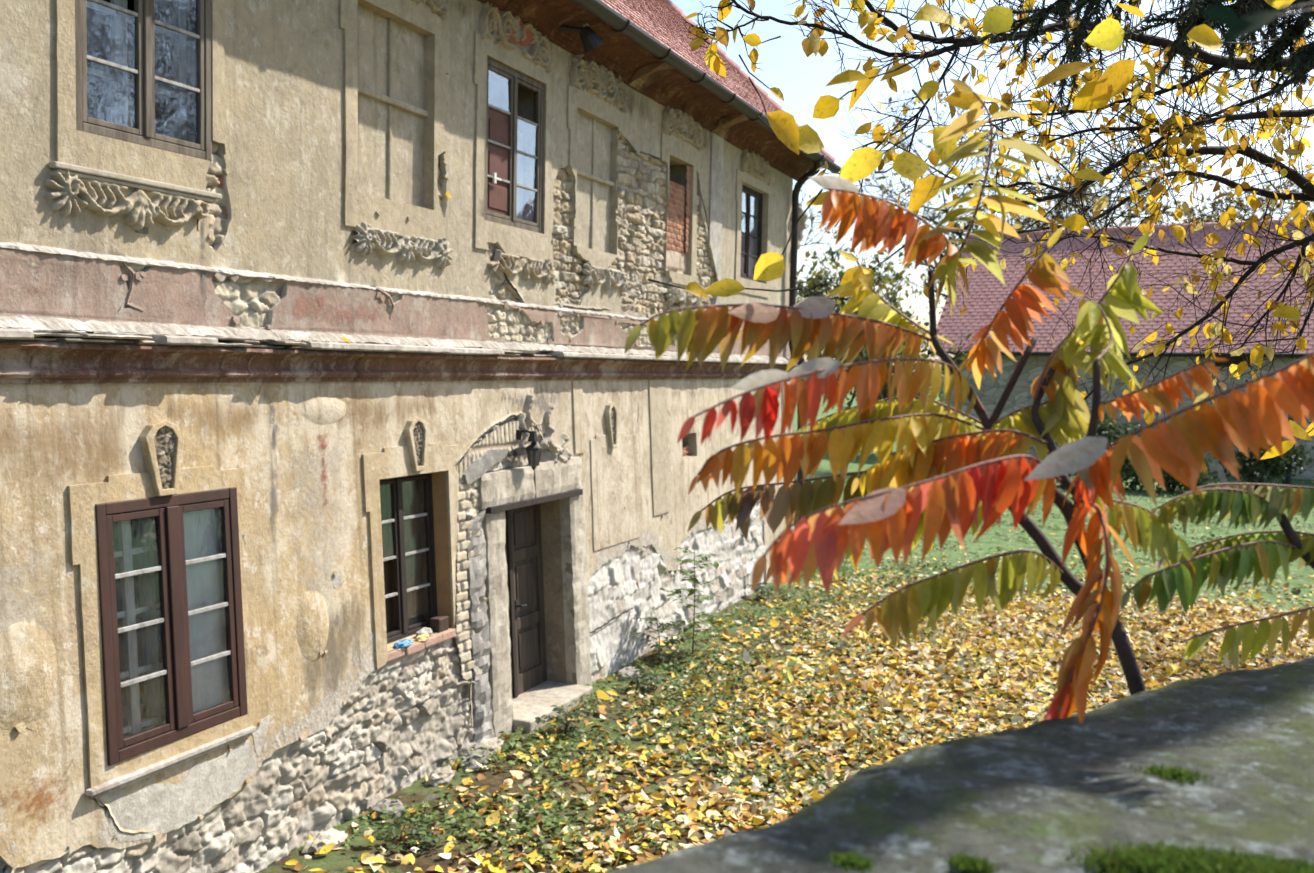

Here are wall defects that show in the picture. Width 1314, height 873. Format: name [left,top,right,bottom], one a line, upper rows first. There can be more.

flaking render [487,167,593,345]
flaking render [608,132,681,346]
flaking render [697,195,715,311]
flaking render [488,425,565,471]
flaking render [0,416,518,873]
flaking render [588,501,766,682]